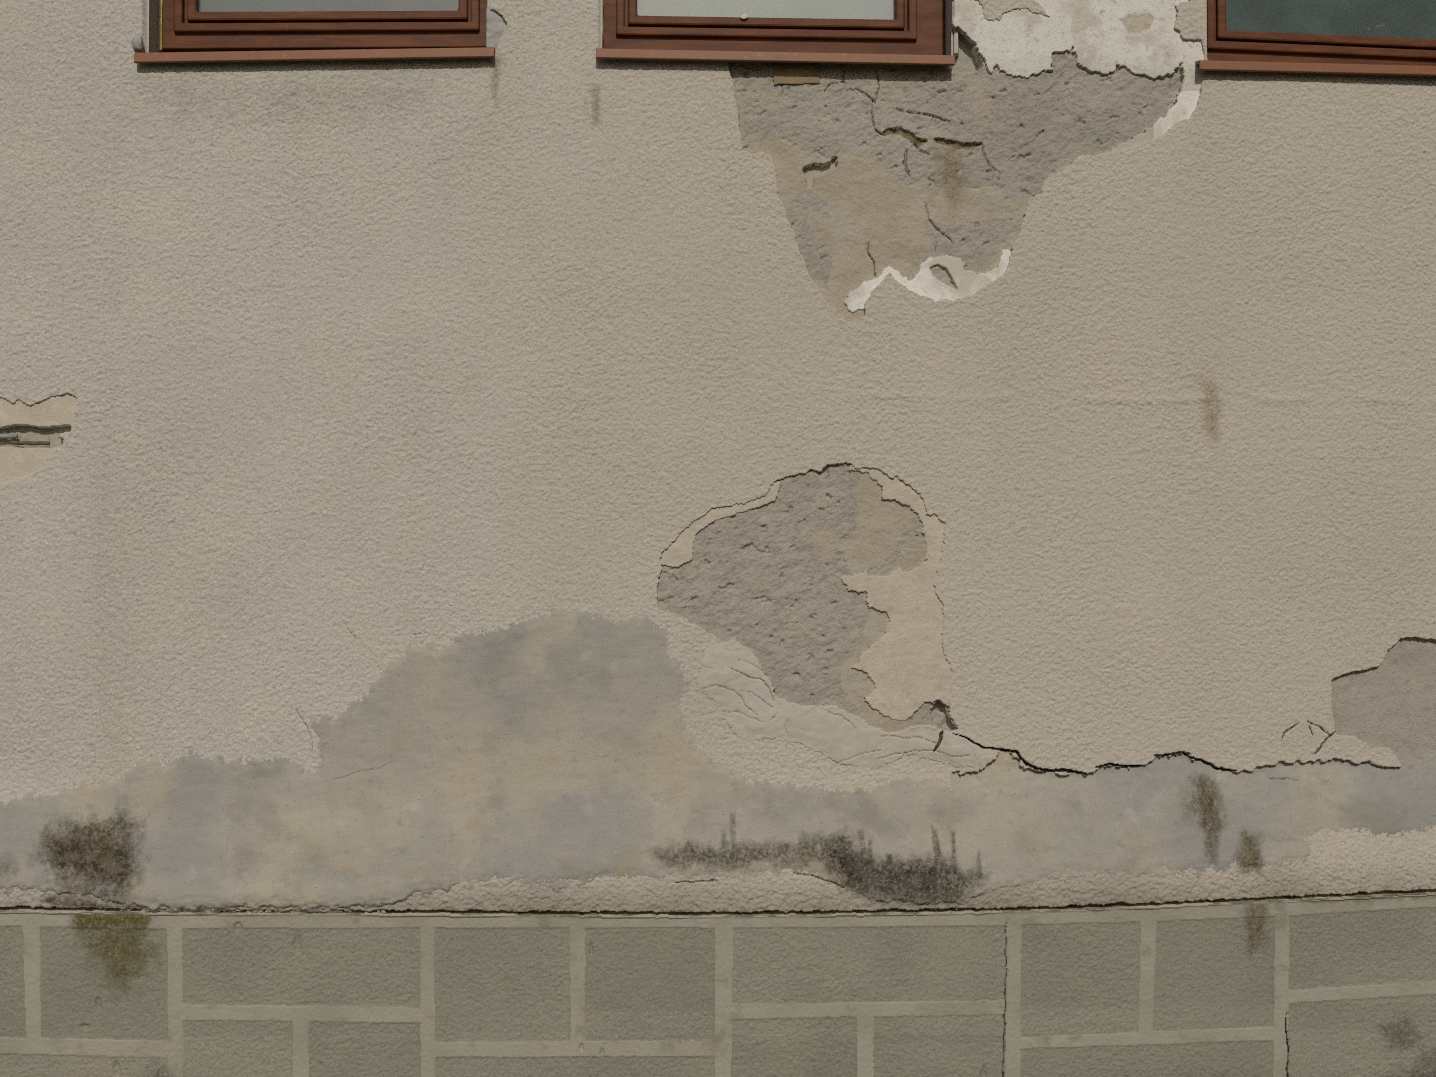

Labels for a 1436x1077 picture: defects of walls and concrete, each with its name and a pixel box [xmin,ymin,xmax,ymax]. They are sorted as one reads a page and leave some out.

spalling [728,0,1208,322]
spalling [0,393,78,484]
spalling [657,462,1000,770]
crack [717,663,775,718]
crack [825,710,1236,774]
crack [1270,721,1335,781]
spalling [1332,637,1436,763]
water stain [45,815,149,976]
water stain [659,837,981,901]